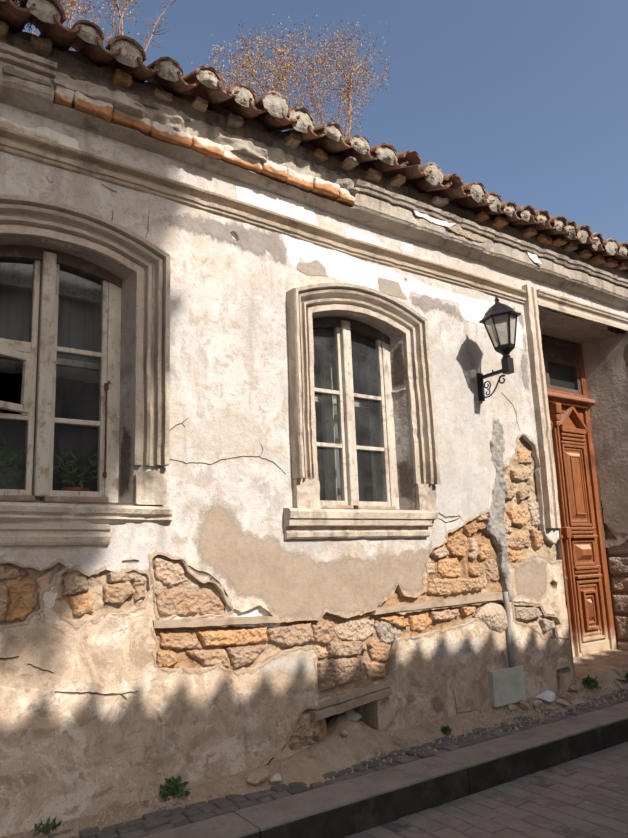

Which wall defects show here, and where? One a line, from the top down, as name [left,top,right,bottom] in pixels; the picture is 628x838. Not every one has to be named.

flaking render [0,65,356,207]
peeling [235,186,319,226]
peeling [281,233,524,351]
crack [170,445,286,474]
peeling [0,433,562,749]
crack [0,655,138,700]